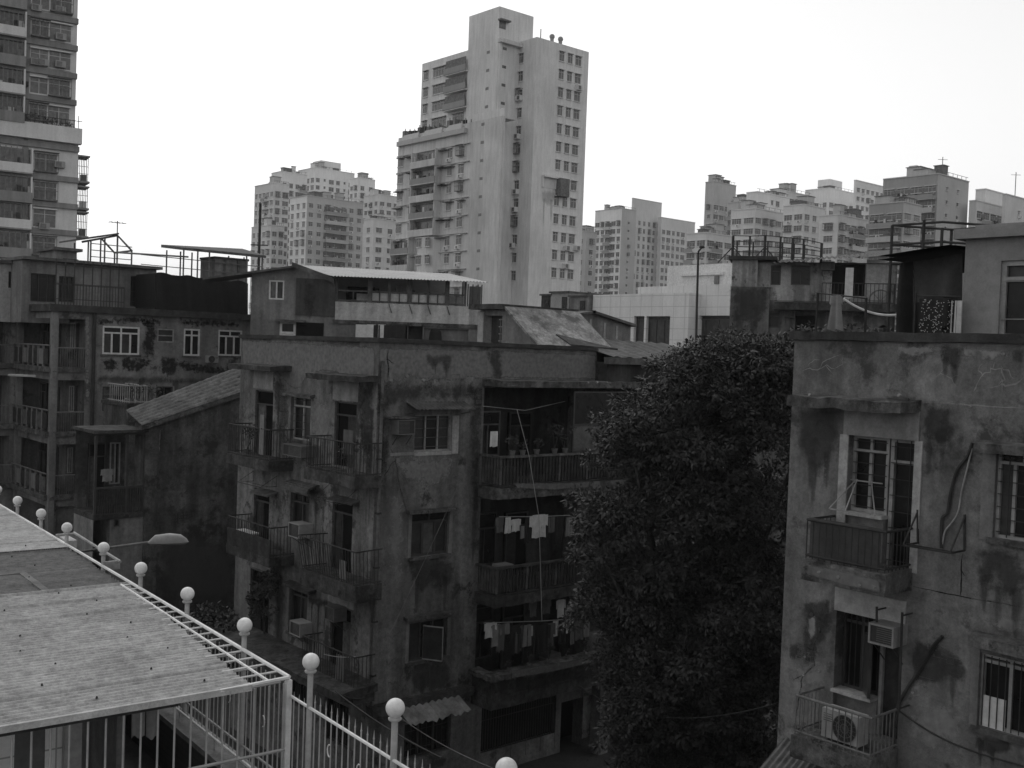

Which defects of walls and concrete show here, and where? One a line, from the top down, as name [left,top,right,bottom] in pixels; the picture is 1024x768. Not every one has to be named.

crack [923,362,1024,408]
damp [925,408,953,443]
damp [979,552,1024,595]
damp [913,637,965,681]